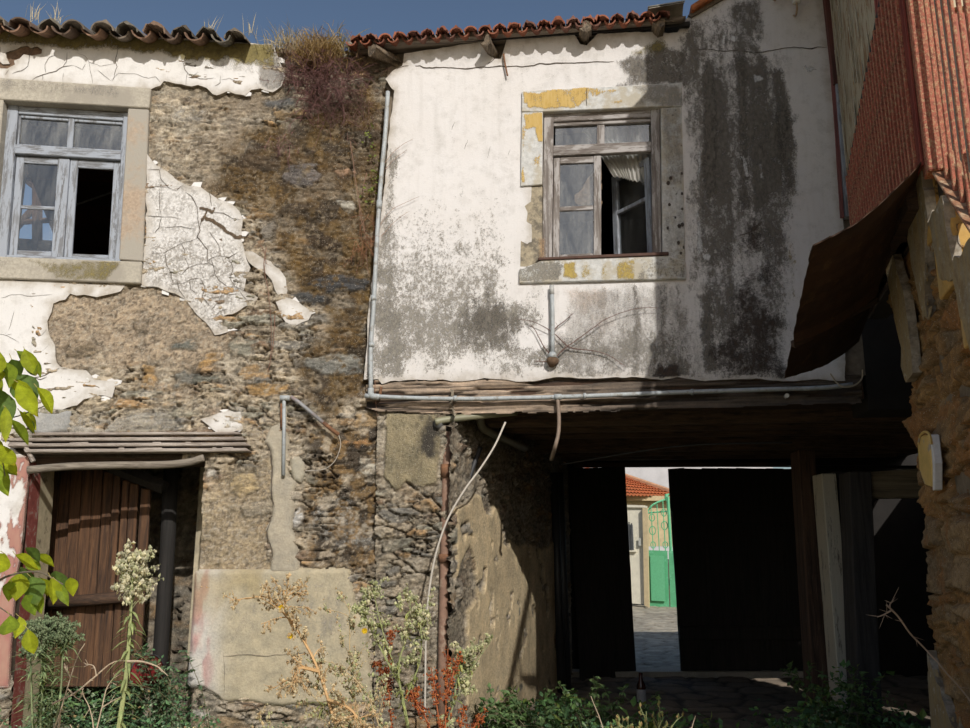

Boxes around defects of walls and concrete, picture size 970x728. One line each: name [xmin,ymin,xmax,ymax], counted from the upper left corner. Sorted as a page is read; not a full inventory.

crack [5,46,158,82]
crack [397,41,614,69]
peeling [522,87,622,141]
damp [620,0,797,378]
crack [148,163,246,314]
damp [519,261,563,283]
damp [455,286,528,349]
peeling [0,47,573,728]